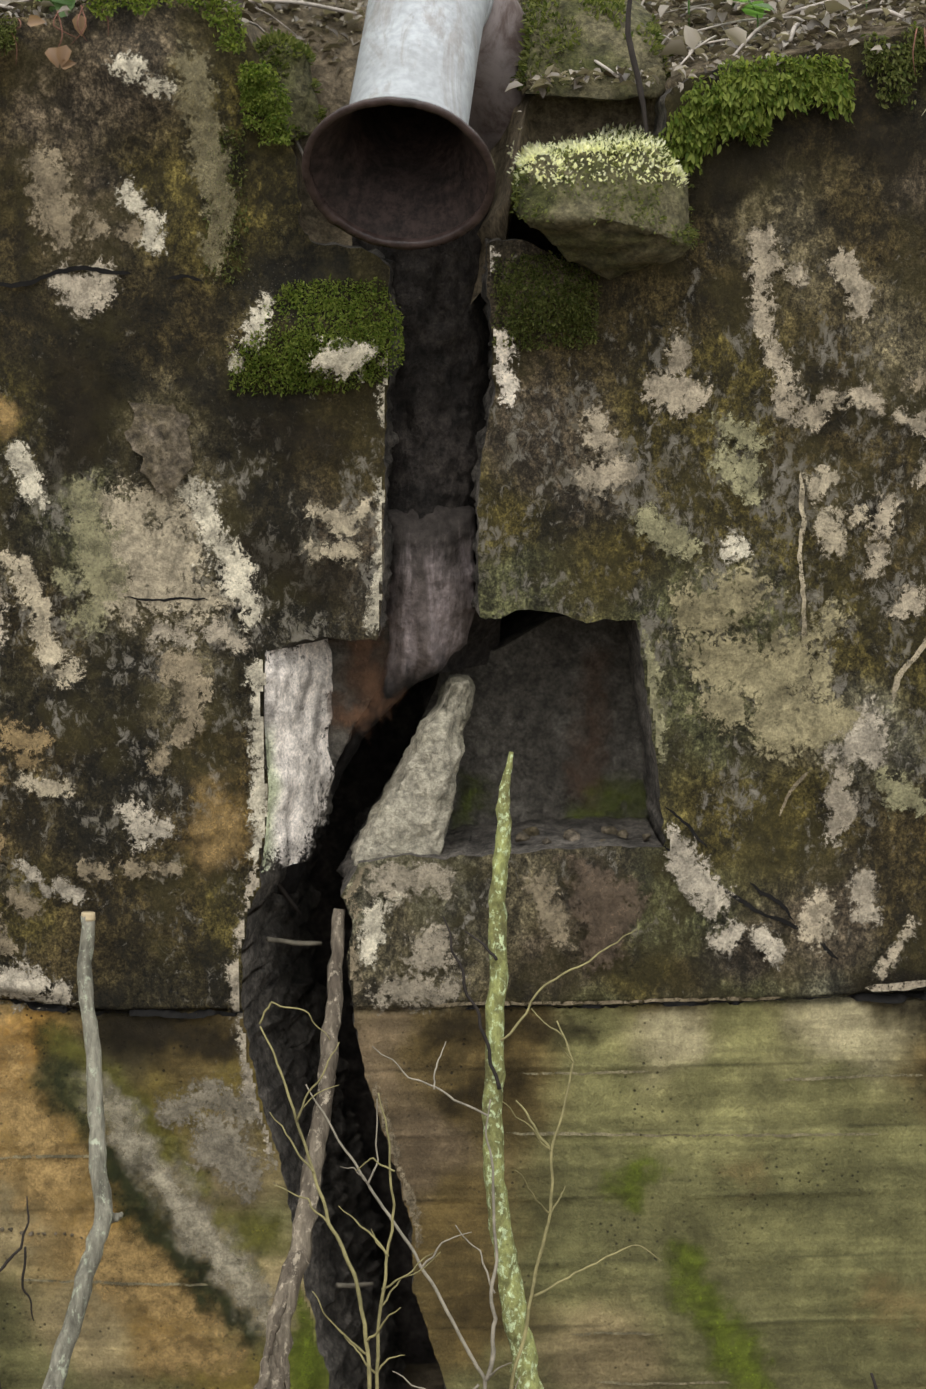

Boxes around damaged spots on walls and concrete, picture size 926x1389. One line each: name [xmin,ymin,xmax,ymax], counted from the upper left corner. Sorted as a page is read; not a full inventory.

crack [378,257,403,636]
crack [470,238,495,614]
leakage [35,1022,279,1346]
leakage [99,1009,241,1066]
crack [0,807,429,1389]